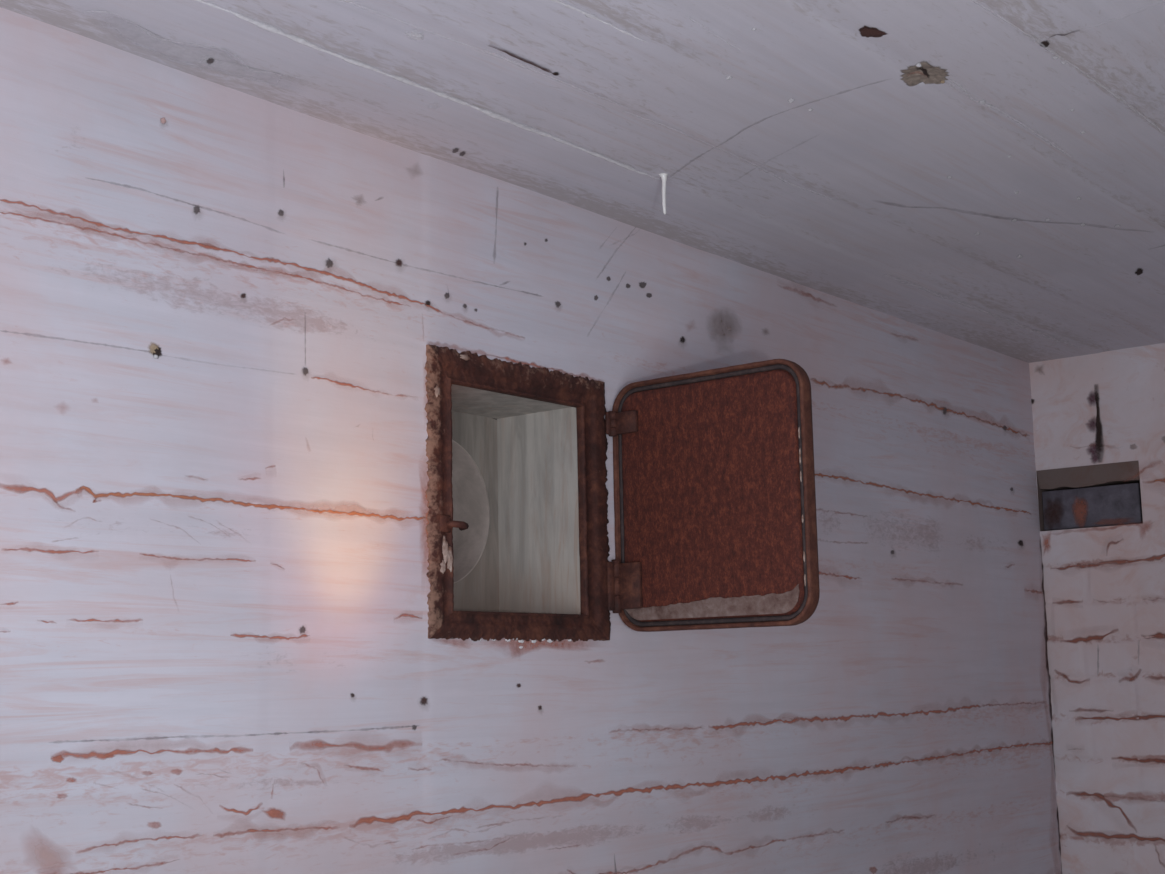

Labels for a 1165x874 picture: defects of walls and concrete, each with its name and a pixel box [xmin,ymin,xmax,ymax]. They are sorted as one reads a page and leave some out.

spalling [859,26,886,37]
spalling [901,62,964,90]
crack [87,542,1165,874]